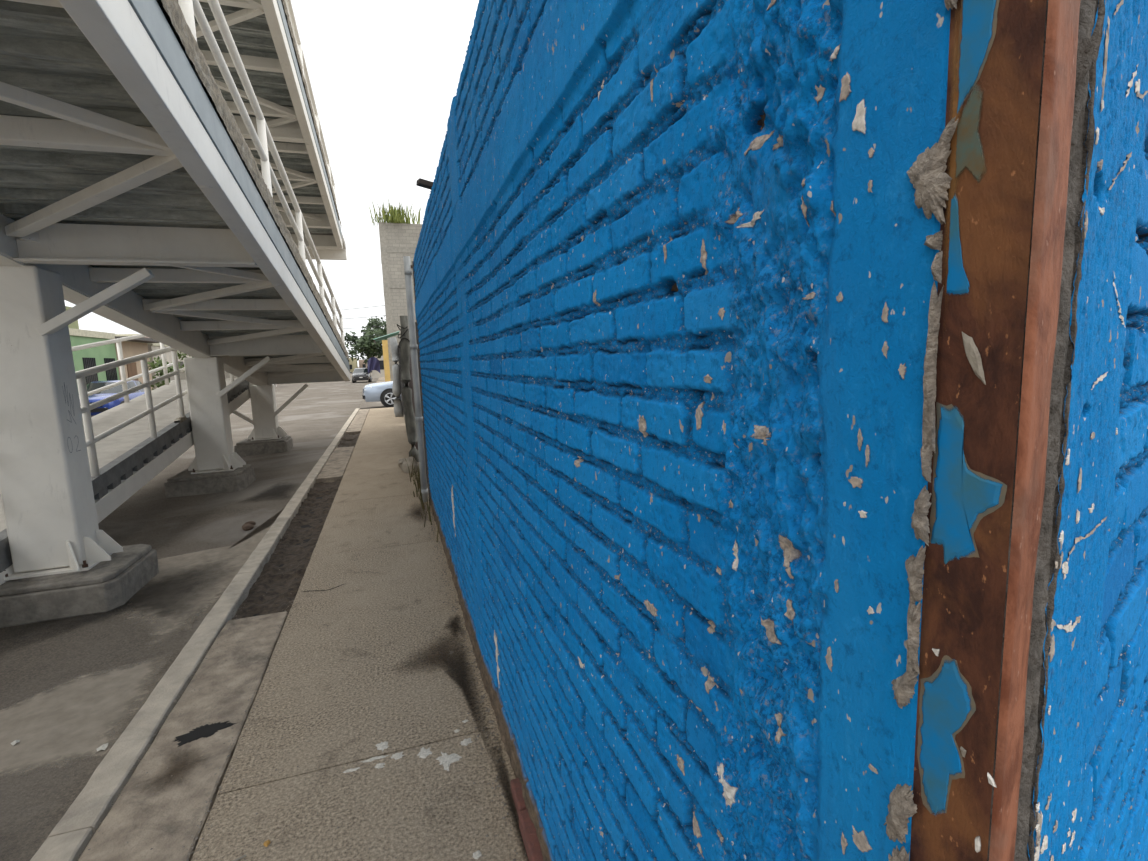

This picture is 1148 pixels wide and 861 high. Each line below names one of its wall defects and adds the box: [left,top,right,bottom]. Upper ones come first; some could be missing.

peeling [839,72,866,134]
corrosion [945,45,961,259]
peeling [884,0,1048,861]
spalling [1014,0,1110,861]
water stain [0,660,163,776]
water stain [123,508,284,644]
water stain [418,617,480,728]
peeling [761,599,795,645]
peeling [779,535,801,579]
water stain [496,750,529,861]
peeling [717,764,738,812]
peeling [841,825,872,854]